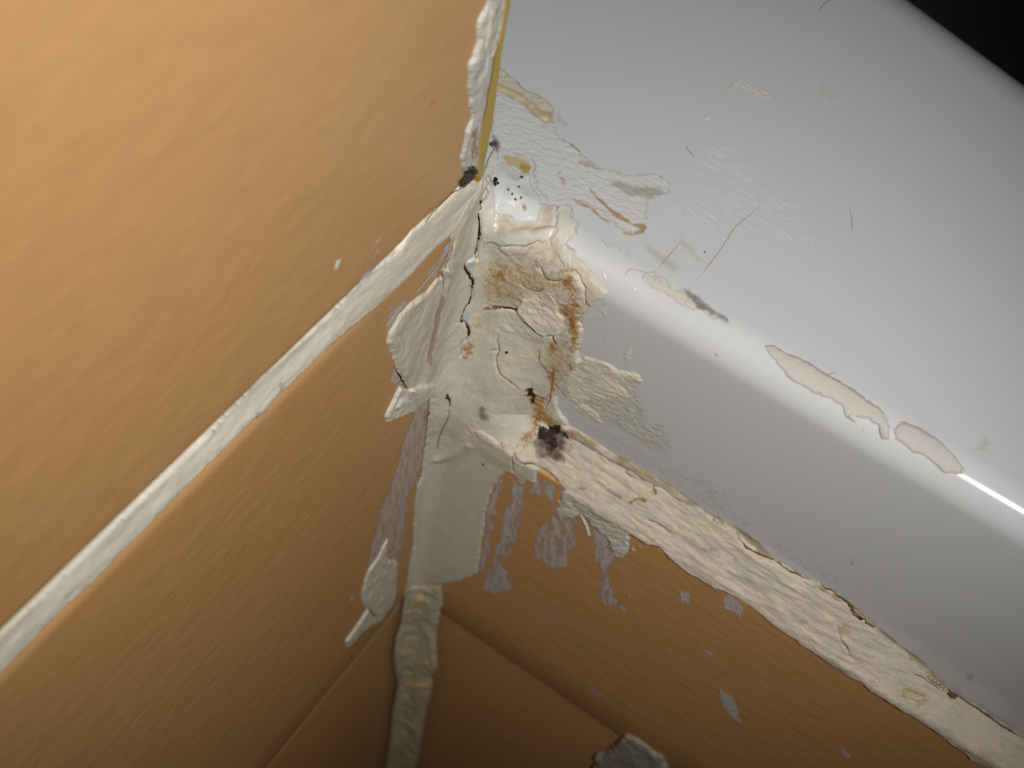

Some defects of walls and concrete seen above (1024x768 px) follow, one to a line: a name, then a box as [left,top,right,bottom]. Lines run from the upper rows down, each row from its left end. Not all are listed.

peeling [486,162,541,222]
crack [425,188,558,354]
rust [483,262,538,310]
peeling [517,293,564,337]
rust [546,269,582,352]
crack [490,337,516,386]
peeling [255,382,284,419]
peeling [384,382,437,422]
rust [522,340,572,443]